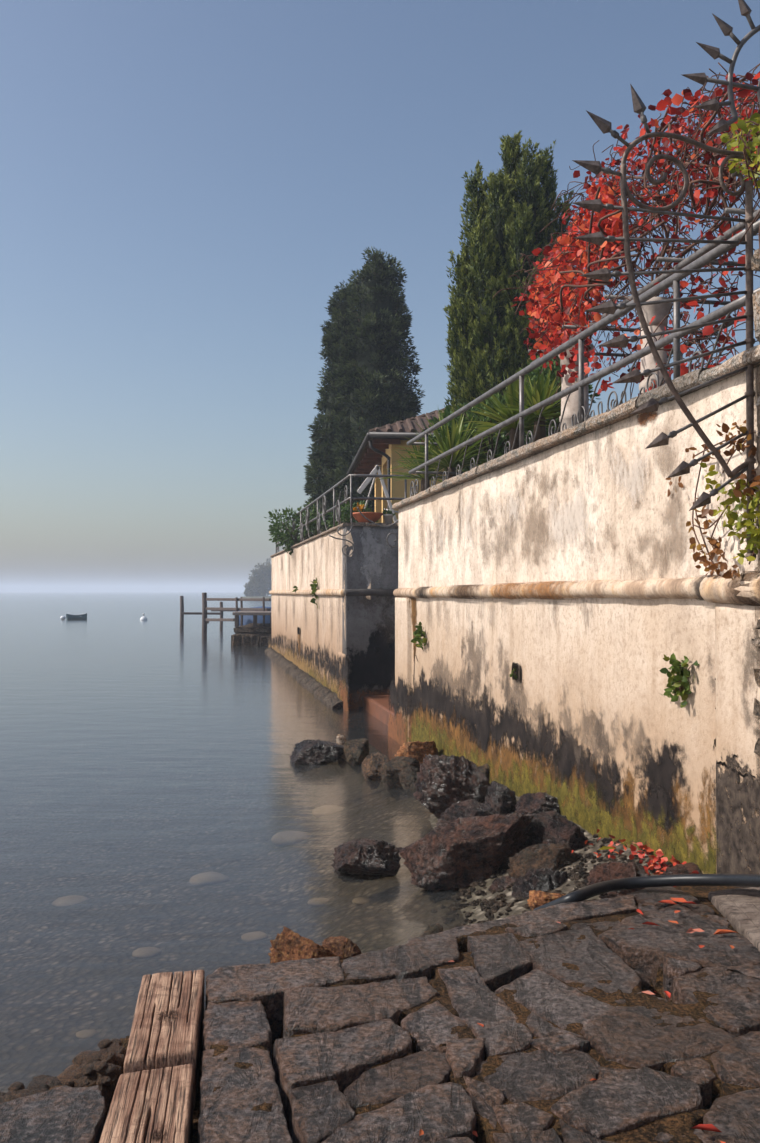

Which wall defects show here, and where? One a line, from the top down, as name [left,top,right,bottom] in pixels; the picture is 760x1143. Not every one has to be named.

water stain [499,467,594,564]
water stain [611,445,670,498]
water stain [627,485,684,576]
water stain [268,636,349,697]
water stain [406,669,685,832]
peeling [712,618,760,888]